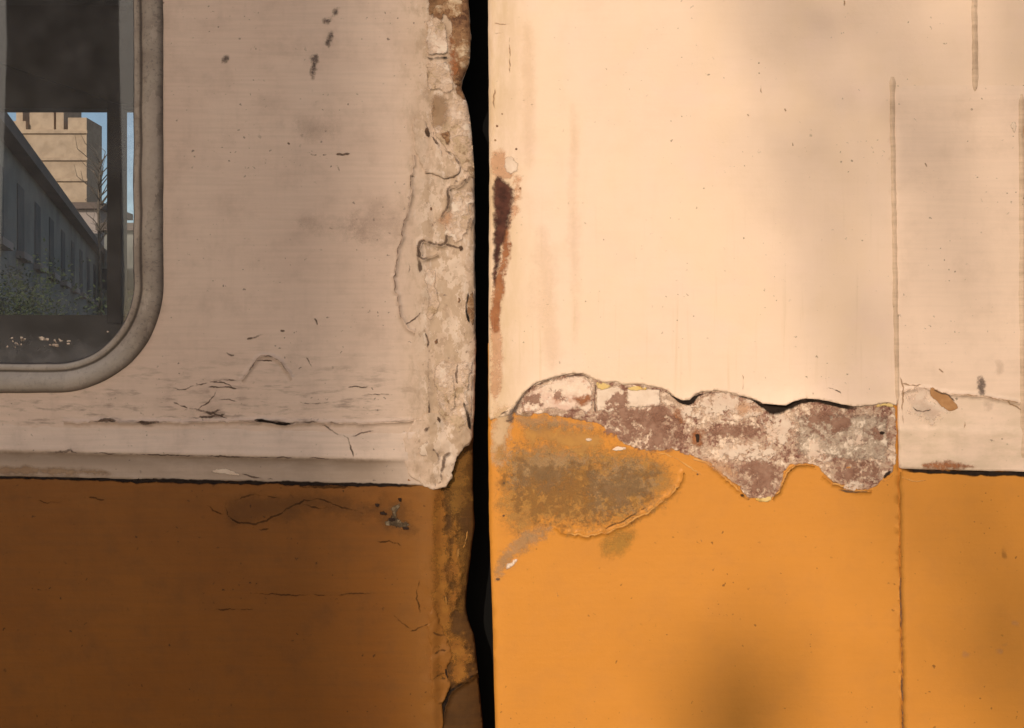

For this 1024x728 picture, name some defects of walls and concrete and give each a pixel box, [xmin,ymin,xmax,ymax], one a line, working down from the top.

peeling [412,0,475,179]
peeling [458,292,475,325]
corrosion [490,113,521,397]
crack [0,351,430,530]
peeling [434,361,473,432]
spalling [491,373,897,542]
peeling [906,386,958,425]